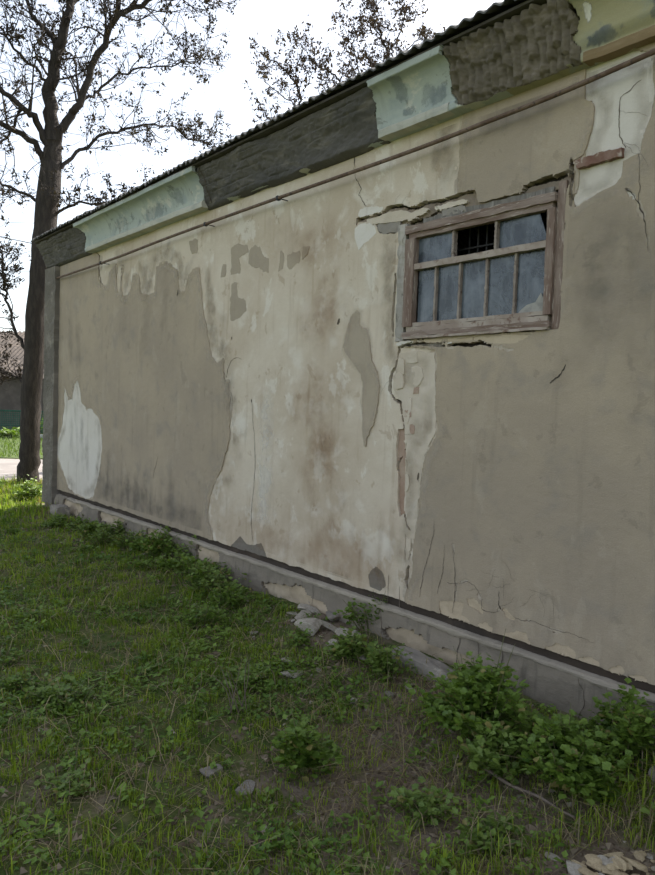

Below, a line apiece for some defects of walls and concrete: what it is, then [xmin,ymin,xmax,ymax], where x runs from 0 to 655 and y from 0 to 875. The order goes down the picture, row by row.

peeling [526,51,655,207]
crack [618,80,650,248]
peeling [97,115,529,602]
peeling [57,381,102,517]
spalling [264,583,327,614]
spalling [386,627,473,670]
flaking render [439,598,493,632]
crack [419,533,594,643]
flaking render [503,631,530,645]
flaking render [545,643,647,682]